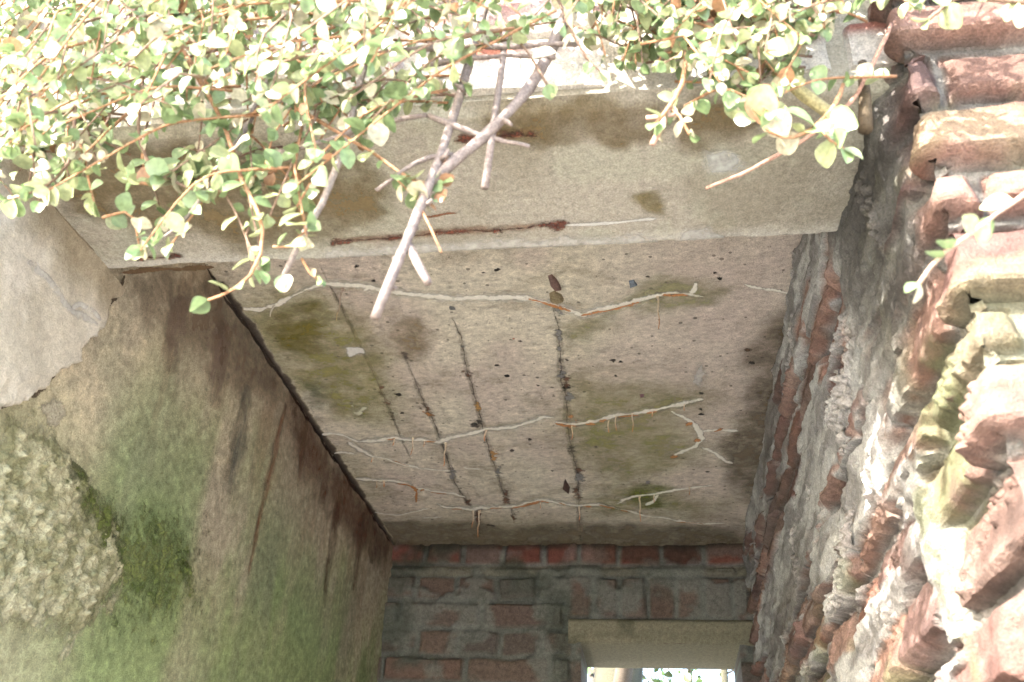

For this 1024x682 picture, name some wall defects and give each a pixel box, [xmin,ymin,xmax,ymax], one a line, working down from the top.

damp [636,193,661,212]
rust [331,220,569,246]
damp [347,347,365,357]
crack [205,265,738,545]
spalling [0,376,125,663]